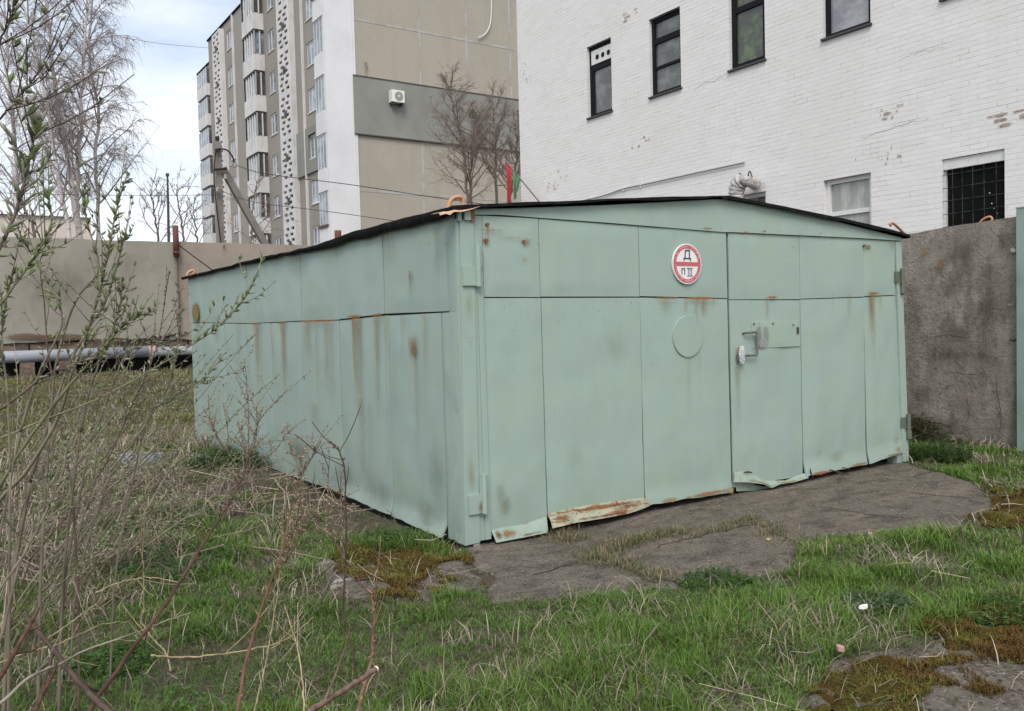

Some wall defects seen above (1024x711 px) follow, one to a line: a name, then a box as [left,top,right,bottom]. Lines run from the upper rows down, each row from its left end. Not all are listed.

peeling [987,109,1024,127]
crack [940,372,1001,434]
corrosion [558,502,634,521]